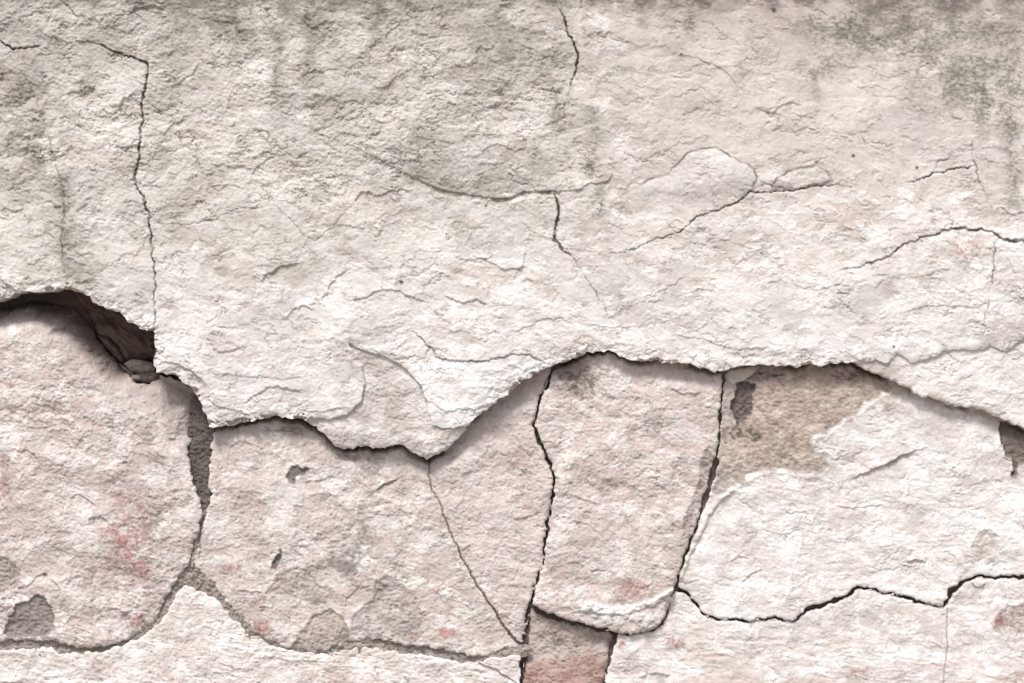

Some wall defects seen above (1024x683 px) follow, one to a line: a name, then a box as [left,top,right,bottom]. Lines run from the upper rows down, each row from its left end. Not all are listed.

crack [560,10,579,85]
crack [76,40,157,323]
crack [553,194,568,254]
crack [896,227,1017,250]
spalling [69,290,163,384]
spalling [307,343,466,460]
spalling [286,466,308,483]
crack [429,363,1024,683]
peeling [580,339,1024,632]
spalling [4,595,54,638]
peeling [271,551,425,651]